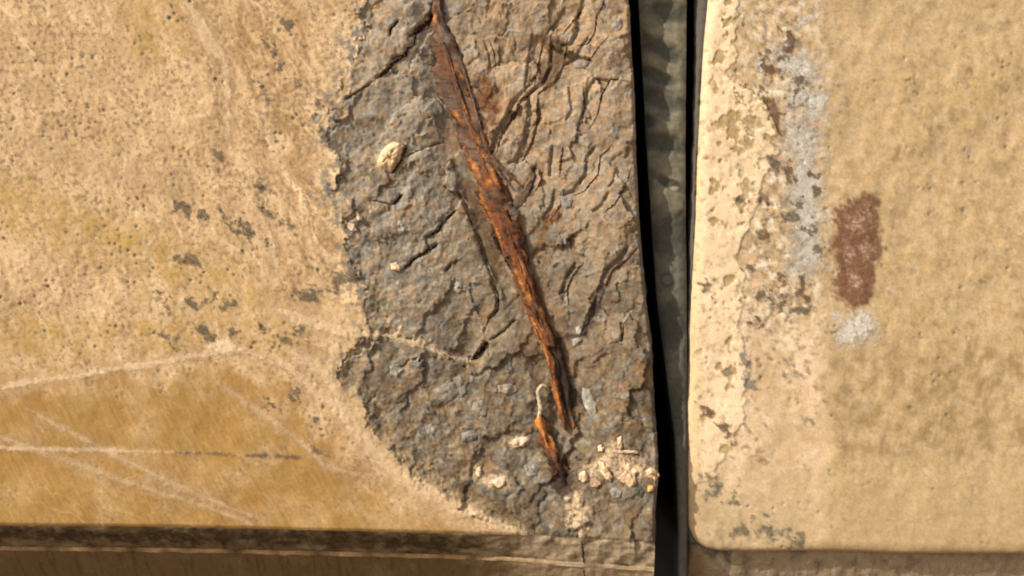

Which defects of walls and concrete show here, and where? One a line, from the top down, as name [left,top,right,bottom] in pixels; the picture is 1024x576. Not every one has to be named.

crack [346,17,433,99]
crack [372,143,440,205]
corrosion [458,56,536,221]
crack [494,0,625,305]
water stain [747,7,829,329]
crack [403,184,515,360]
spalling [324,0,660,542]
corrosion [531,291,604,351]
crack [587,246,639,326]
water stain [832,309,878,347]
corrosion [562,386,582,408]